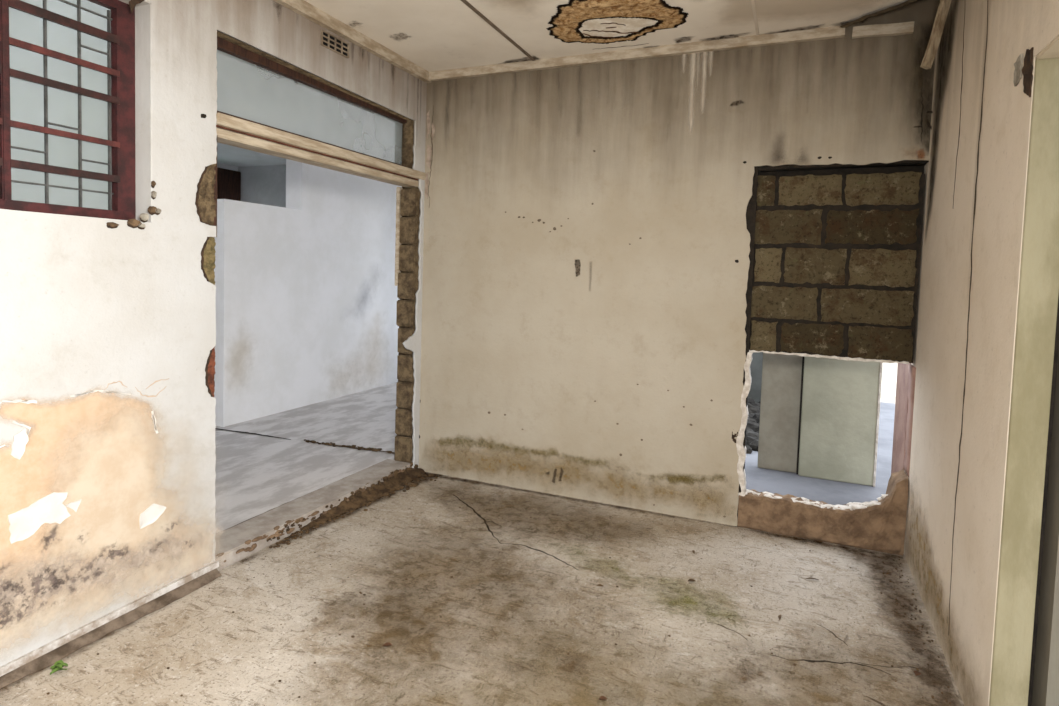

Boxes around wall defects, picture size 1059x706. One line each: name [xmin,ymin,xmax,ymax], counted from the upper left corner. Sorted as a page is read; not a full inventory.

peeling [0,390,327,646]
water stain [437,438,719,506]
water stain [0,524,191,628]